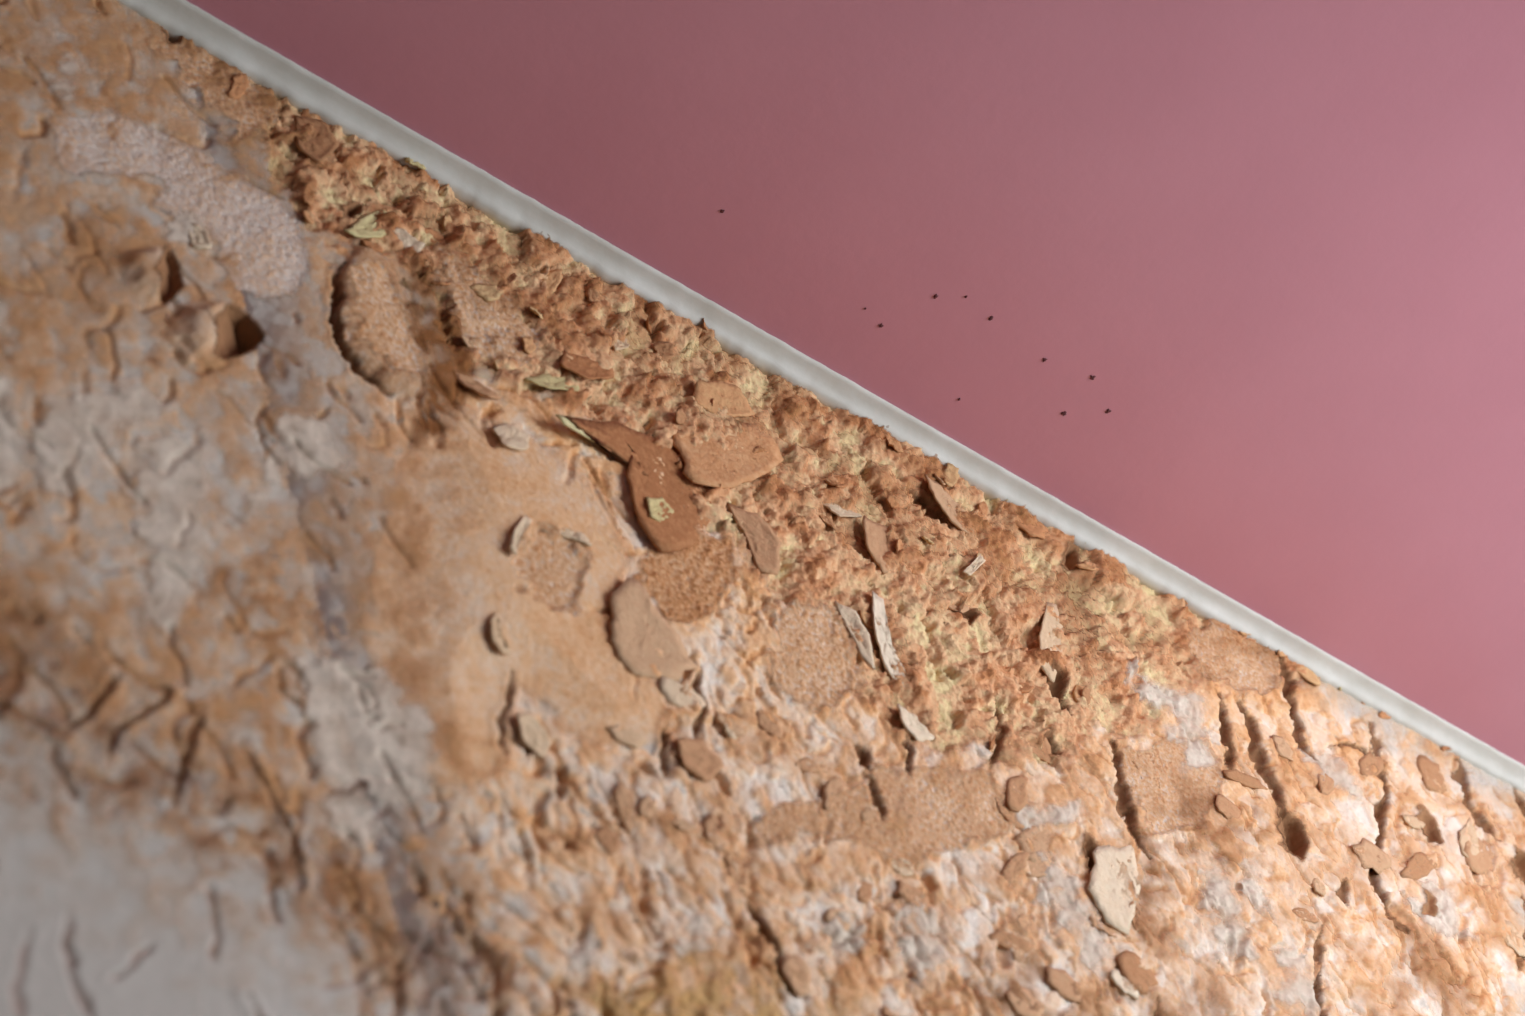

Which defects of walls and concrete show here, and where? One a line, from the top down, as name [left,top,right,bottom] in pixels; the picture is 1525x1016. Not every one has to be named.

leakage [0,0,237,167]
leakage [0,177,201,373]
leakage [0,377,178,497]
leakage [243,408,359,507]
flaking render [0,0,1212,915]
leakage [0,428,463,922]
peeling [420,366,1525,1016]